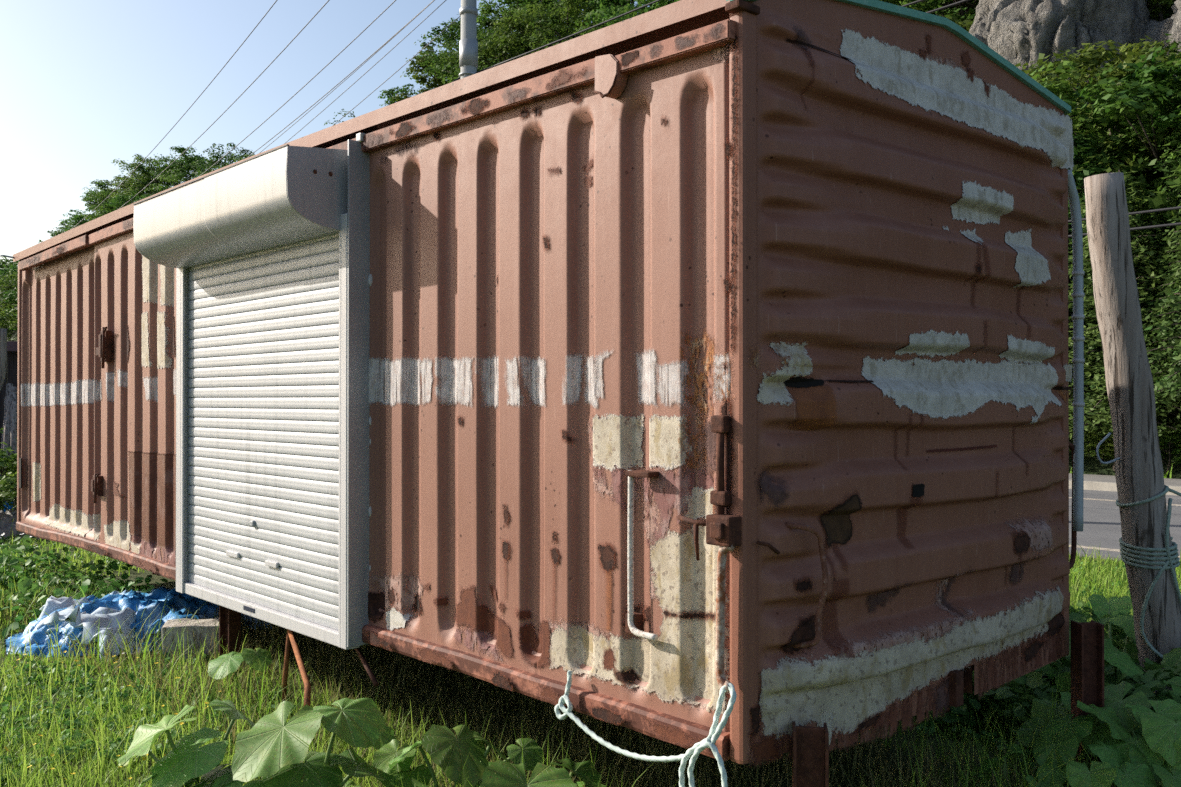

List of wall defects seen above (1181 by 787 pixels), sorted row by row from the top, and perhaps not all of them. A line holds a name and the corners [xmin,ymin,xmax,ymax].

rust [545,45,661,104]
peeling [840,29,1074,170]
rust [675,23,739,515]
peeling [942,180,1051,288]
peeling [862,330,1073,424]
peeling [32,462,141,554]
rust [113,451,176,572]
peeling [420,350,730,714]
rust [363,572,423,650]
rust [414,648,451,667]
rust [781,615,815,655]
peeling [759,586,1064,745]